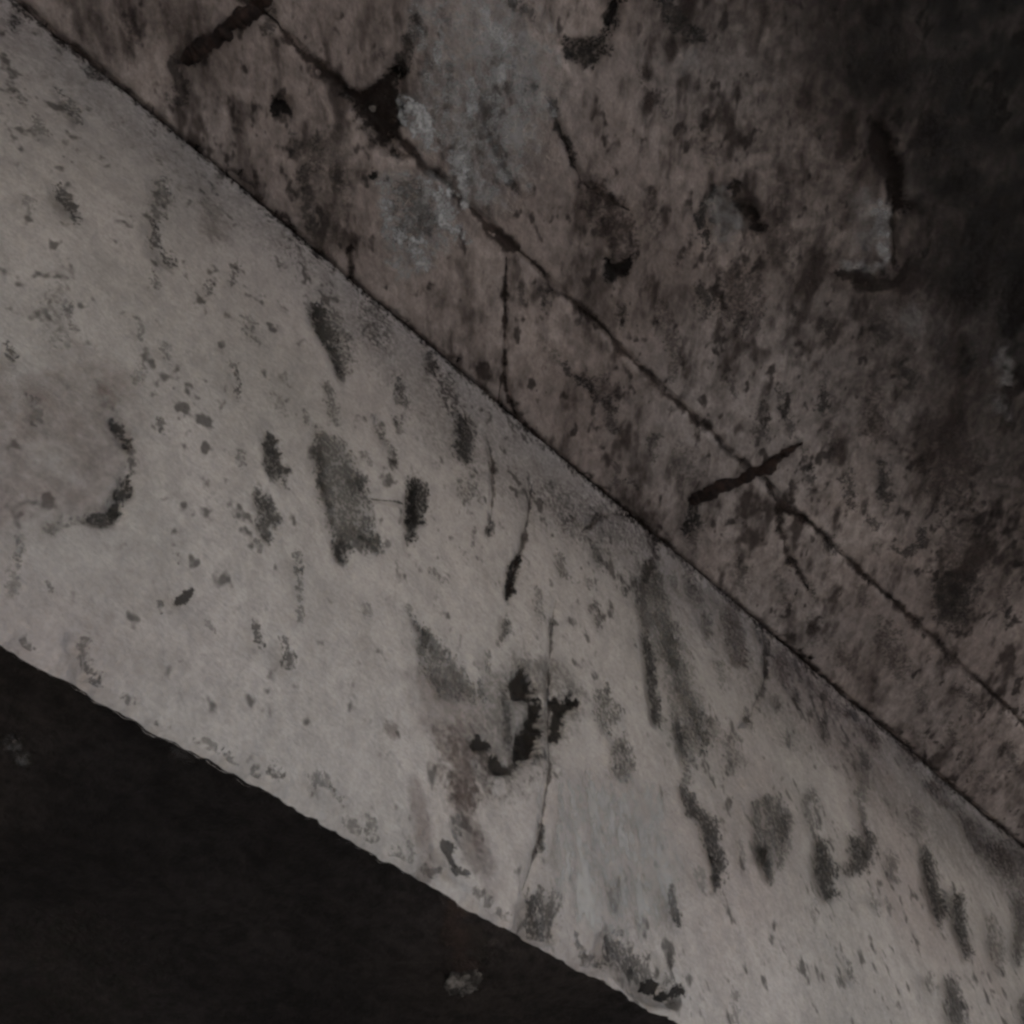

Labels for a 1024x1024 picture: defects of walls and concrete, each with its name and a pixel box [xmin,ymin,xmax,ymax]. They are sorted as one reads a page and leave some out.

water stain [7,0,125,91]
crack [14,0,355,282]
water stain [376,0,554,278]
water stain [917,0,1024,236]
water stain [134,100,1024,849]
crack [238,0,1024,847]
spalling [469,667,581,776]
water stain [709,855,721,893]
water stain [751,793,790,880]